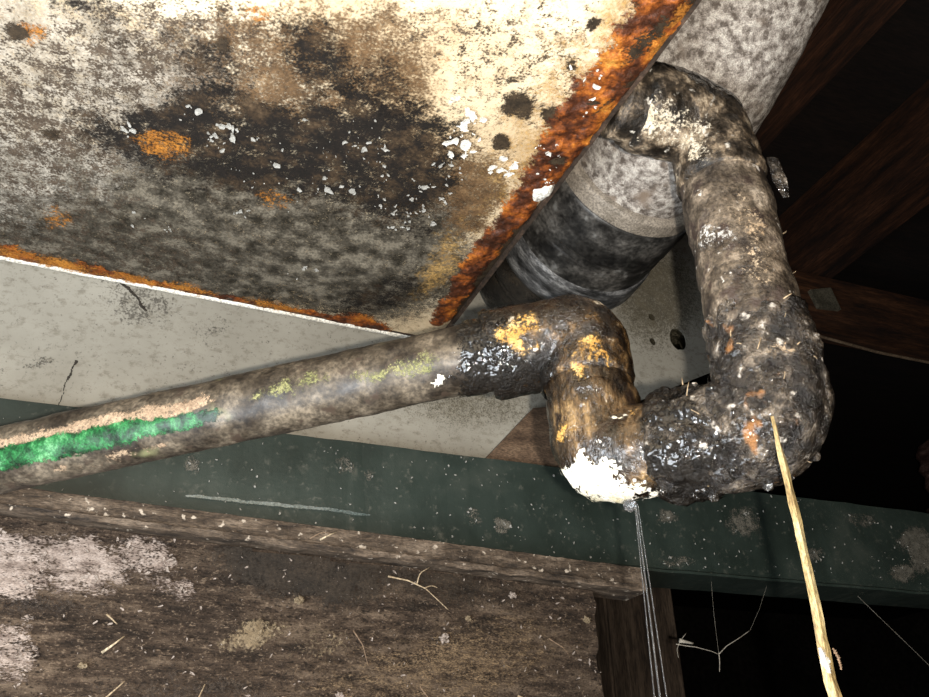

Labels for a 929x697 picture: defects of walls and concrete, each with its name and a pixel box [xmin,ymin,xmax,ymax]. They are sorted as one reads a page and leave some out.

rust [138,130,190,159]
leakage [0,0,526,325]
leakage [498,77,560,127]
rust [424,0,696,326]
rust [0,244,391,332]